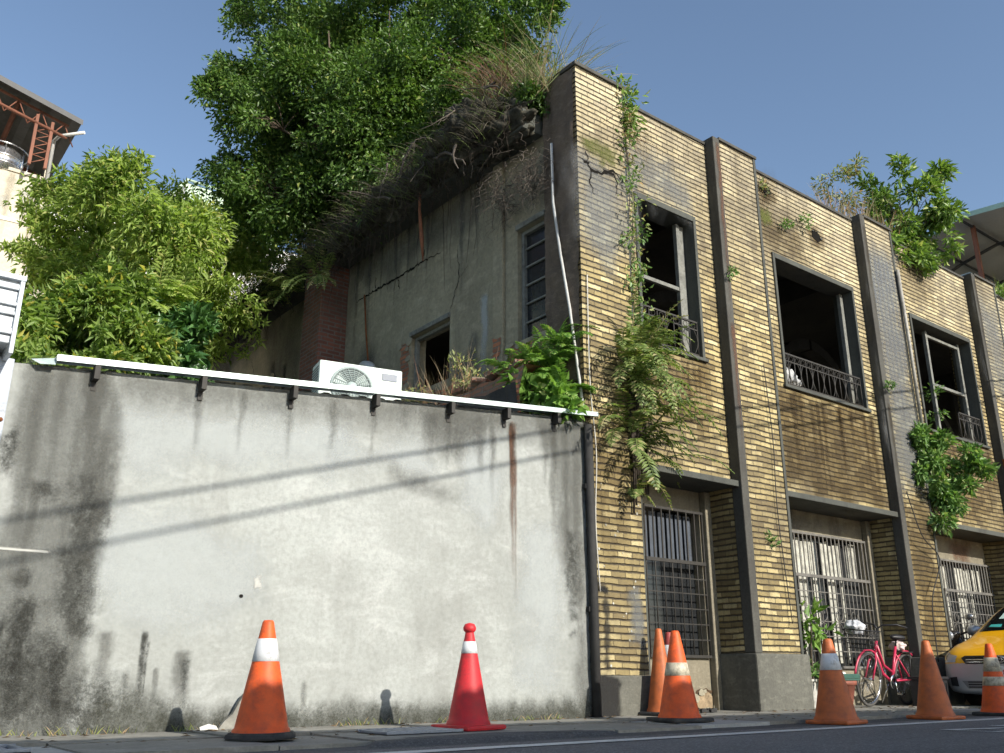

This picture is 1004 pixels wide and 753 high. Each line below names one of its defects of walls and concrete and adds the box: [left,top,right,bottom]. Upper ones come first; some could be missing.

crack [580,151,620,194]
crack [358,250,468,308]
spalling [425,68,614,418]
spalling [397,337,413,391]
corrosion [509,424,517,518]
water stain [0,364,356,736]